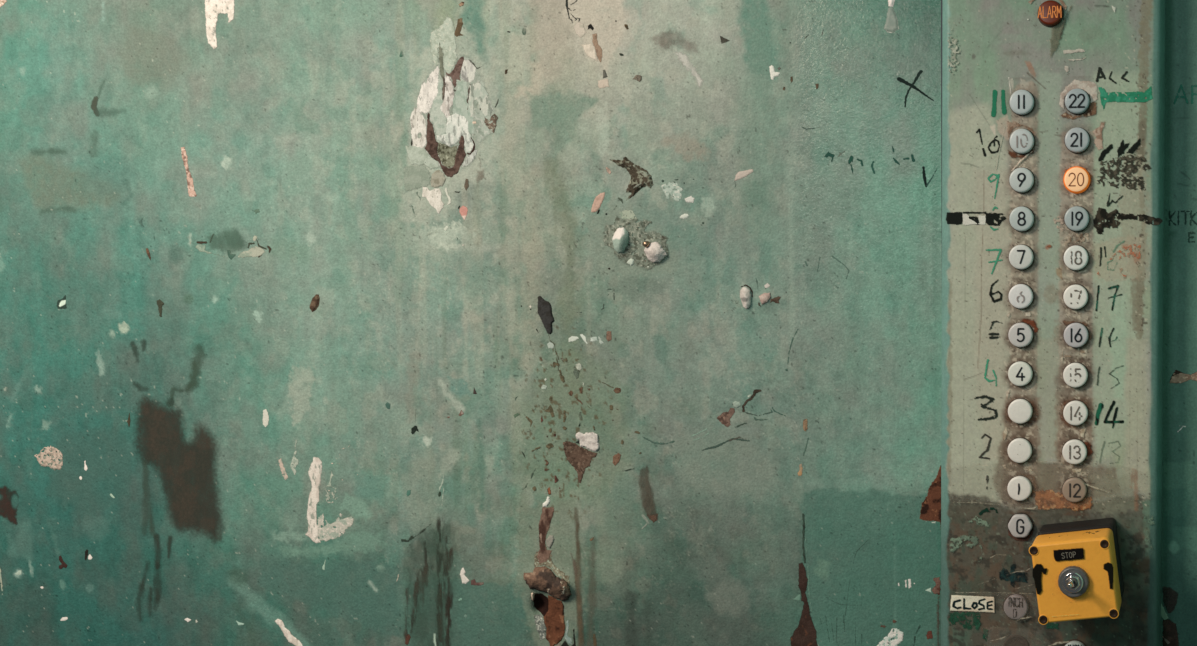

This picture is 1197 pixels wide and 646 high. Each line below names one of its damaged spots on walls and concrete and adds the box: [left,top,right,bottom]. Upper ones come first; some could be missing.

peeling [205,0,235,49]
peeling [404,2,498,246]
spalling [591,192,668,270]
spalling [34,446,63,470]
leakage [136,384,220,569]
flaking render [306,446,349,543]
rust [920,466,941,527]
leakage [401,520,452,646]